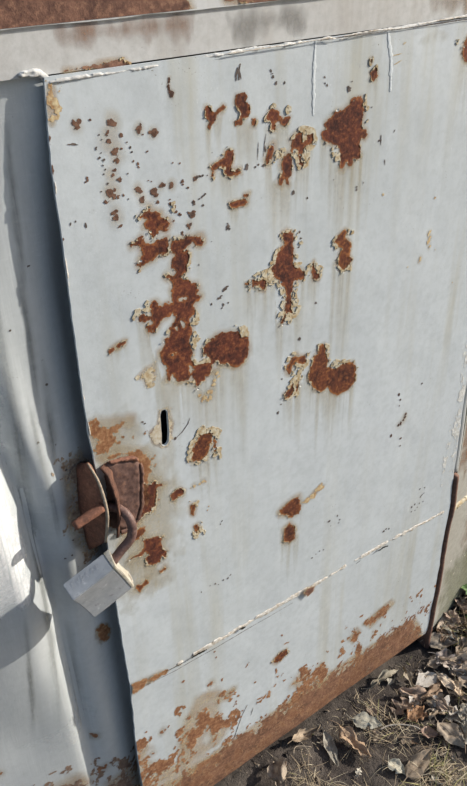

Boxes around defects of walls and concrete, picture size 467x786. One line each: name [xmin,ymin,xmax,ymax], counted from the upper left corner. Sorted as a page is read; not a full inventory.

rust [0,0,192,40]
rust [204,92,369,185]
rust [130,201,250,390]
rust [245,229,324,326]
rust [332,229,354,273]
rust [283,343,359,400]
rust [186,425,222,465]
rust [51,447,99,567]
rust [88,418,169,574]
rust [170,487,206,539]
rust [279,496,302,543]
rust [33,589,432,786]